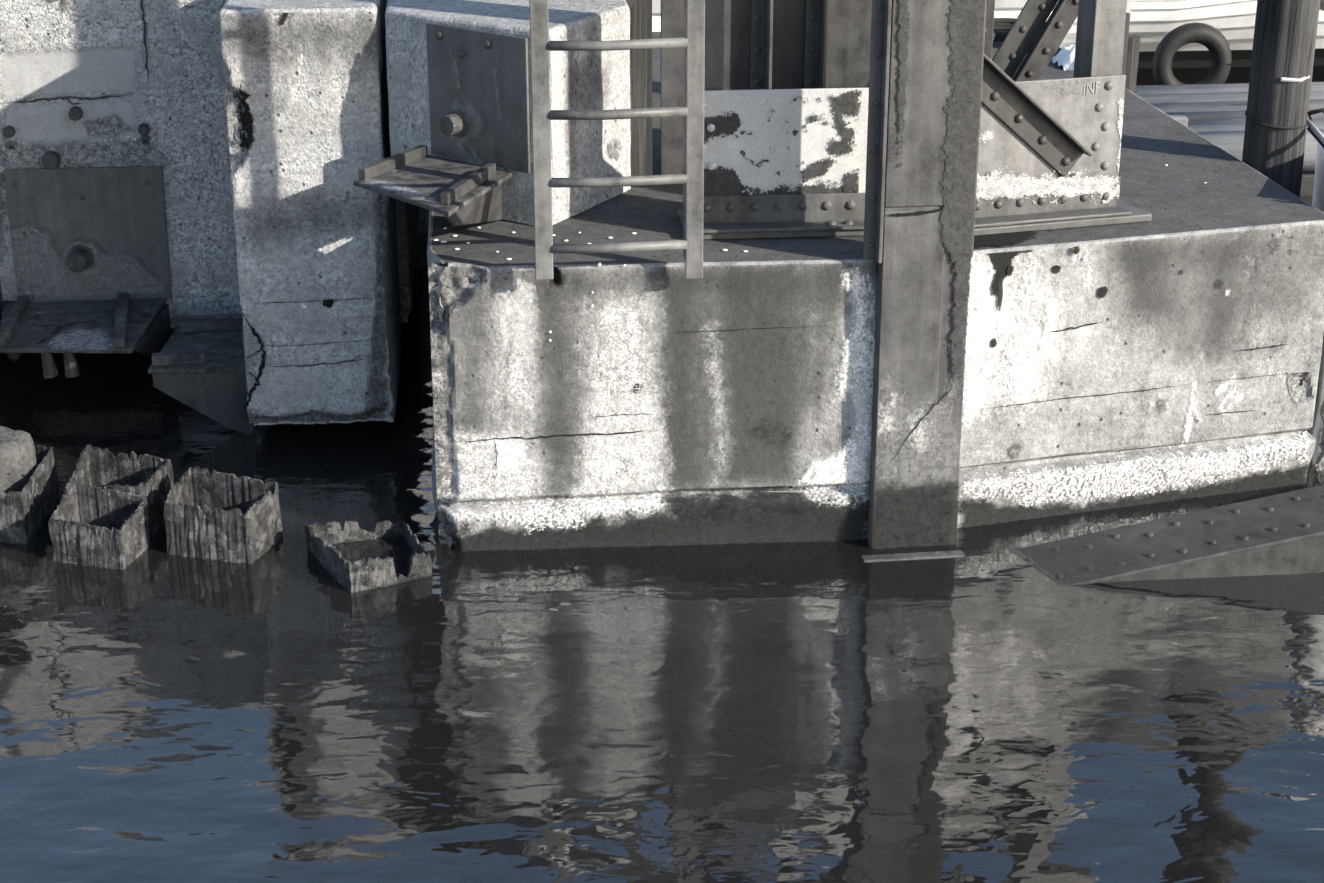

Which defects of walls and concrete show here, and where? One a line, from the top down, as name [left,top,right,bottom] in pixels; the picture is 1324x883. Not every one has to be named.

crack [2,0,149,105]
spalling [0,114,169,266]
crack [239,84,252,152]
peeling [704,89,862,197]
crack [243,297,377,411]
water stain [440,280,541,512]
crack [448,413,658,466]
water stain [571,266,875,499]
crack [893,386,954,460]
water stain [962,253,1064,425]
spalling [1287,375,1311,406]